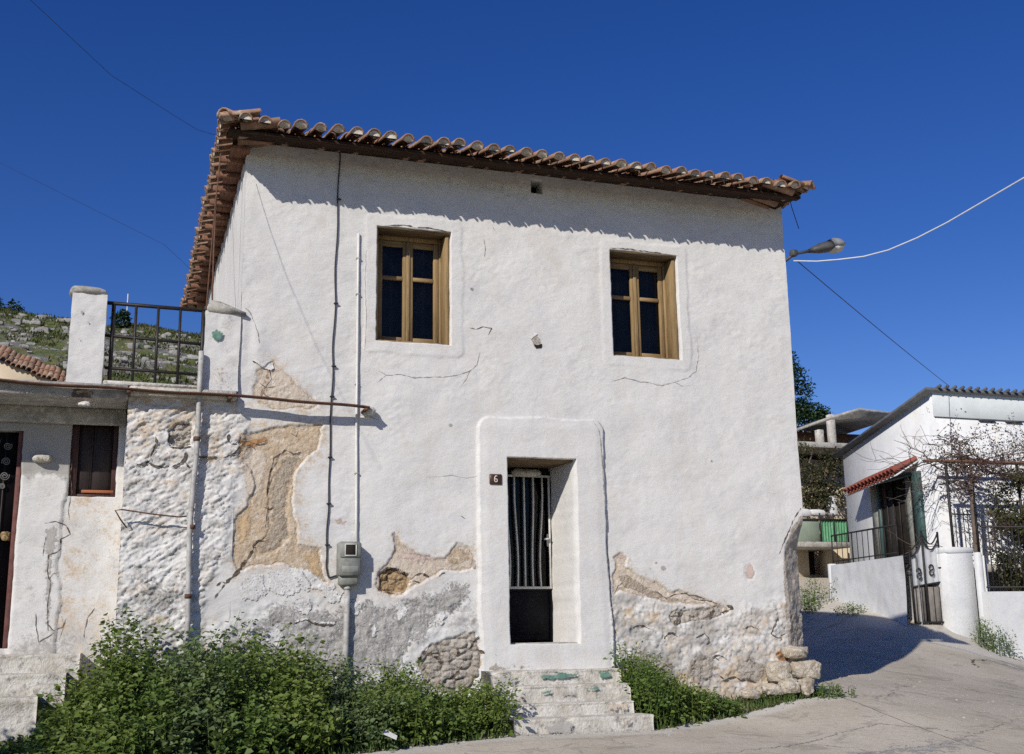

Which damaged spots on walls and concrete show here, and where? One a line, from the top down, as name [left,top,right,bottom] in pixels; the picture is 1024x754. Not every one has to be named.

flaking render [253,359,316,409]
crack [378,326,492,383]
crack [614,343,699,386]
flaking render [168,424,192,449]
crack [35,462,95,642]
flaking render [217,425,523,693]
flaking render [614,554,733,626]
flaking render [687,652,724,684]